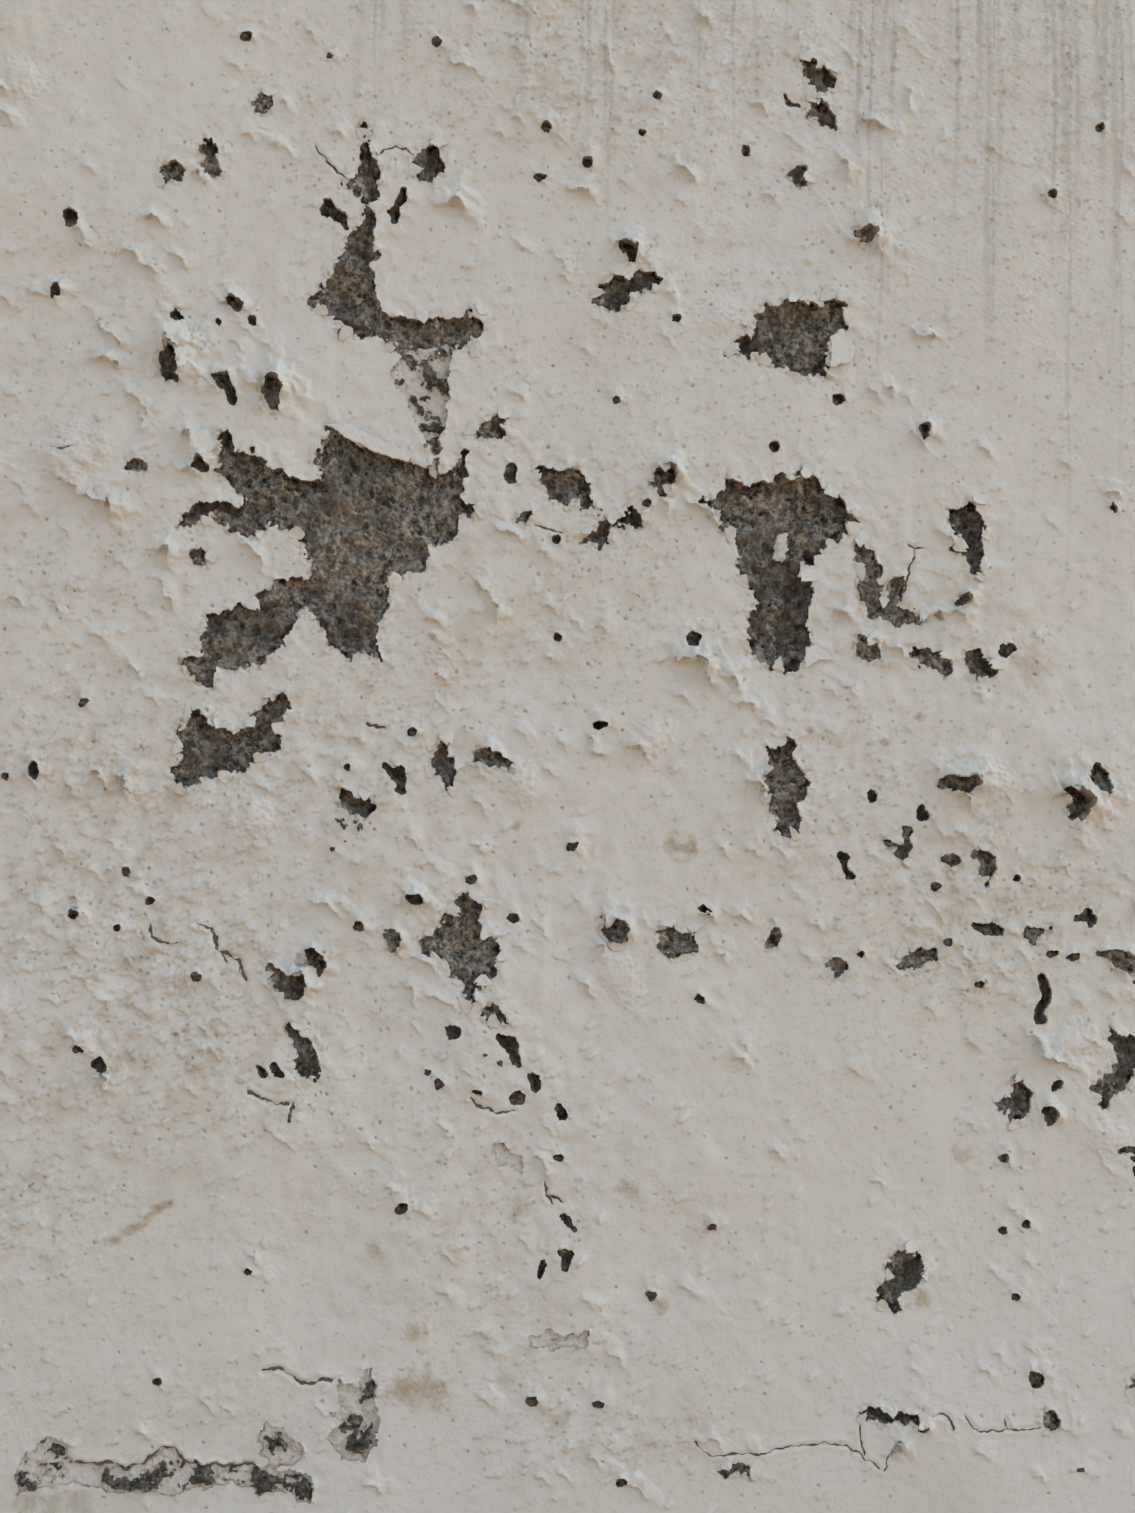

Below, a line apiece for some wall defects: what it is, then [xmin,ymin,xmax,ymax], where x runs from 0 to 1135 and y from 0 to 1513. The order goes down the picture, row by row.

spalling [152,123,920,688]
spalling [915,496,991,622]
spalling [171,684,294,796]
peeling [405,723,519,798]
spalling [744,737,817,841]
peeling [918,763,993,839]
peeling [1050,762,1116,834]
spalling [309,839,544,1084]
spalling [982,916,1135,1170]
spalling [875,1240,931,1314]
peeling [14,1421,317,1504]
peeling [327,1367,386,1462]